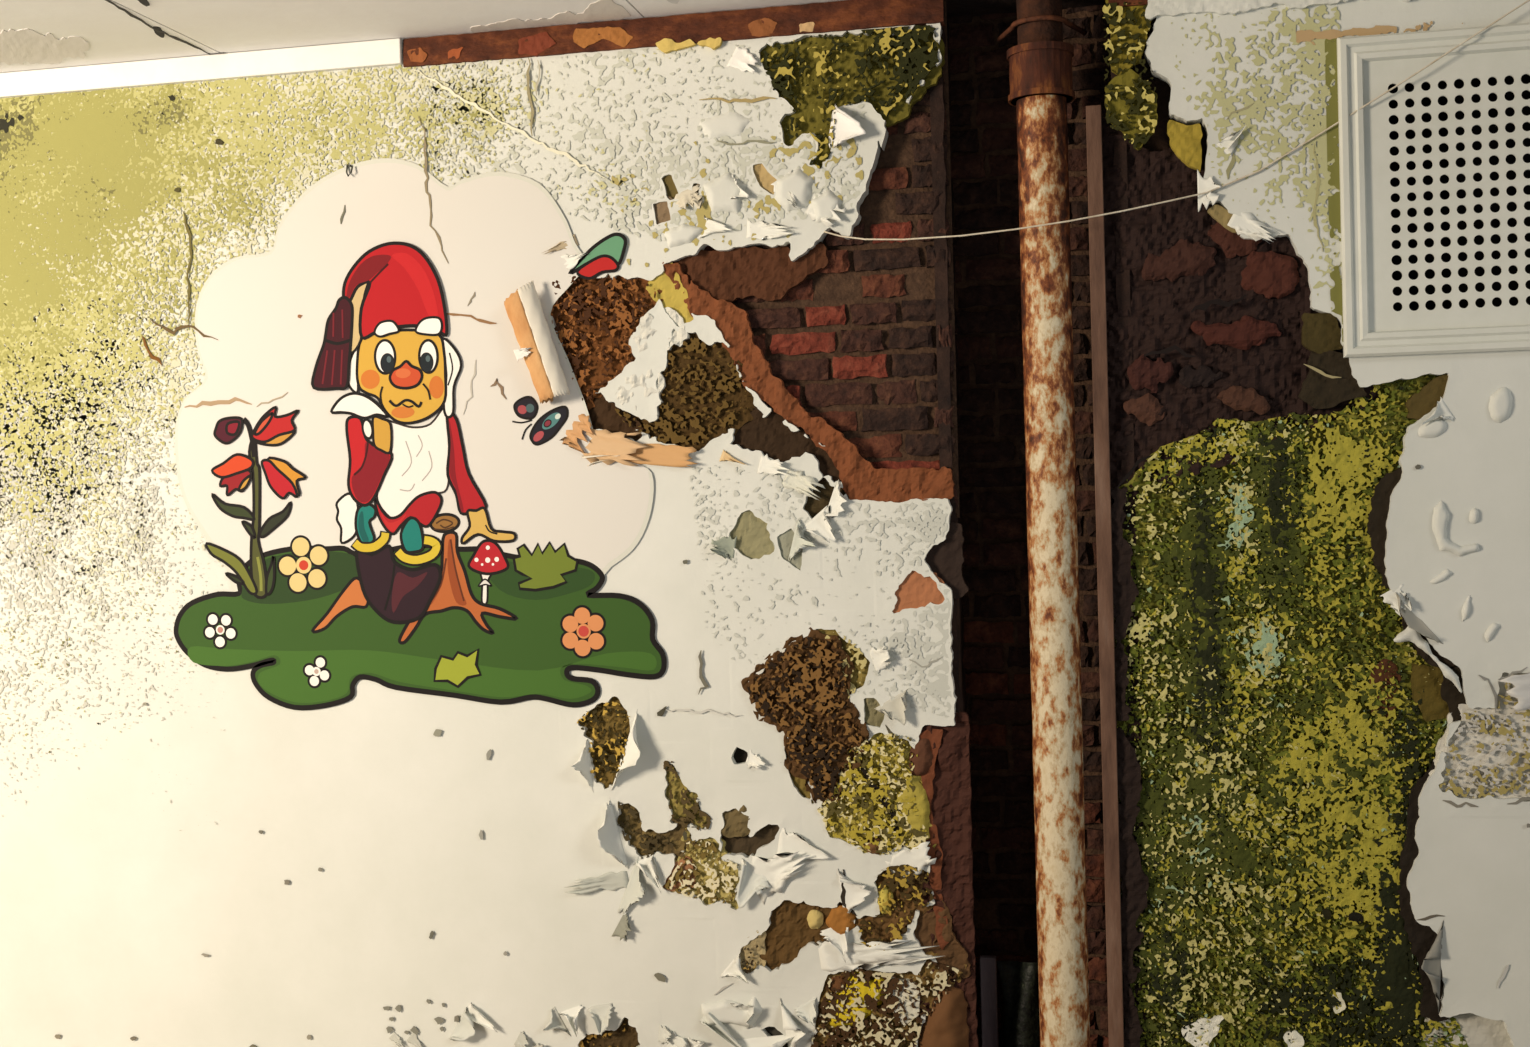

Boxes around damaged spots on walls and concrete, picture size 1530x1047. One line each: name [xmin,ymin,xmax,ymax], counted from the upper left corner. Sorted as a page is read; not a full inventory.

mould [0,96,115,275]
mould [78,85,204,144]
corrosion [407,47,428,63]
corrosion [518,27,633,57]
corrosion [748,18,777,37]
corrosion [799,22,815,32]
flaking render [543,0,969,613]
leakage [0,289,224,803]
spalling [1092,0,1379,1047]
spalling [1369,659,1530,801]
spalling [564,627,979,1047]
spalling [514,1003,640,1047]